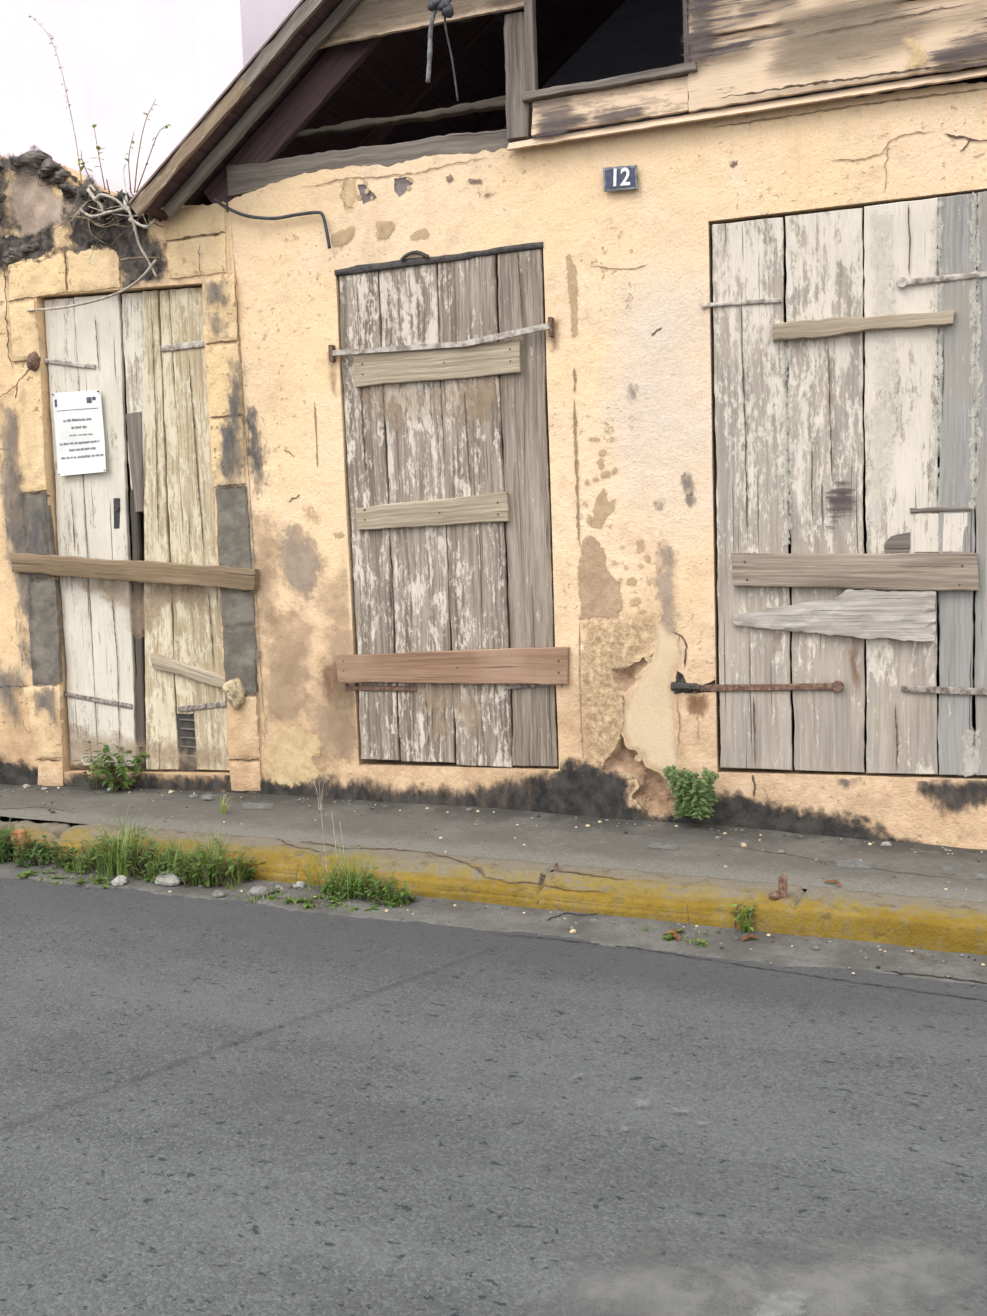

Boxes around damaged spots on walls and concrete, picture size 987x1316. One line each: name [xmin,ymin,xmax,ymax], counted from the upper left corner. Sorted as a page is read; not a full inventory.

crack [711,57,987,128]
crack [831,131,987,190]
peeling [2,174,80,239]
leakage [0,408,52,627]
peeling [577,436,676,817]
leakage [0,644,57,723]
leakage [0,758,38,785]
leakage [63,759,918,843]
leakage [918,779,987,811]